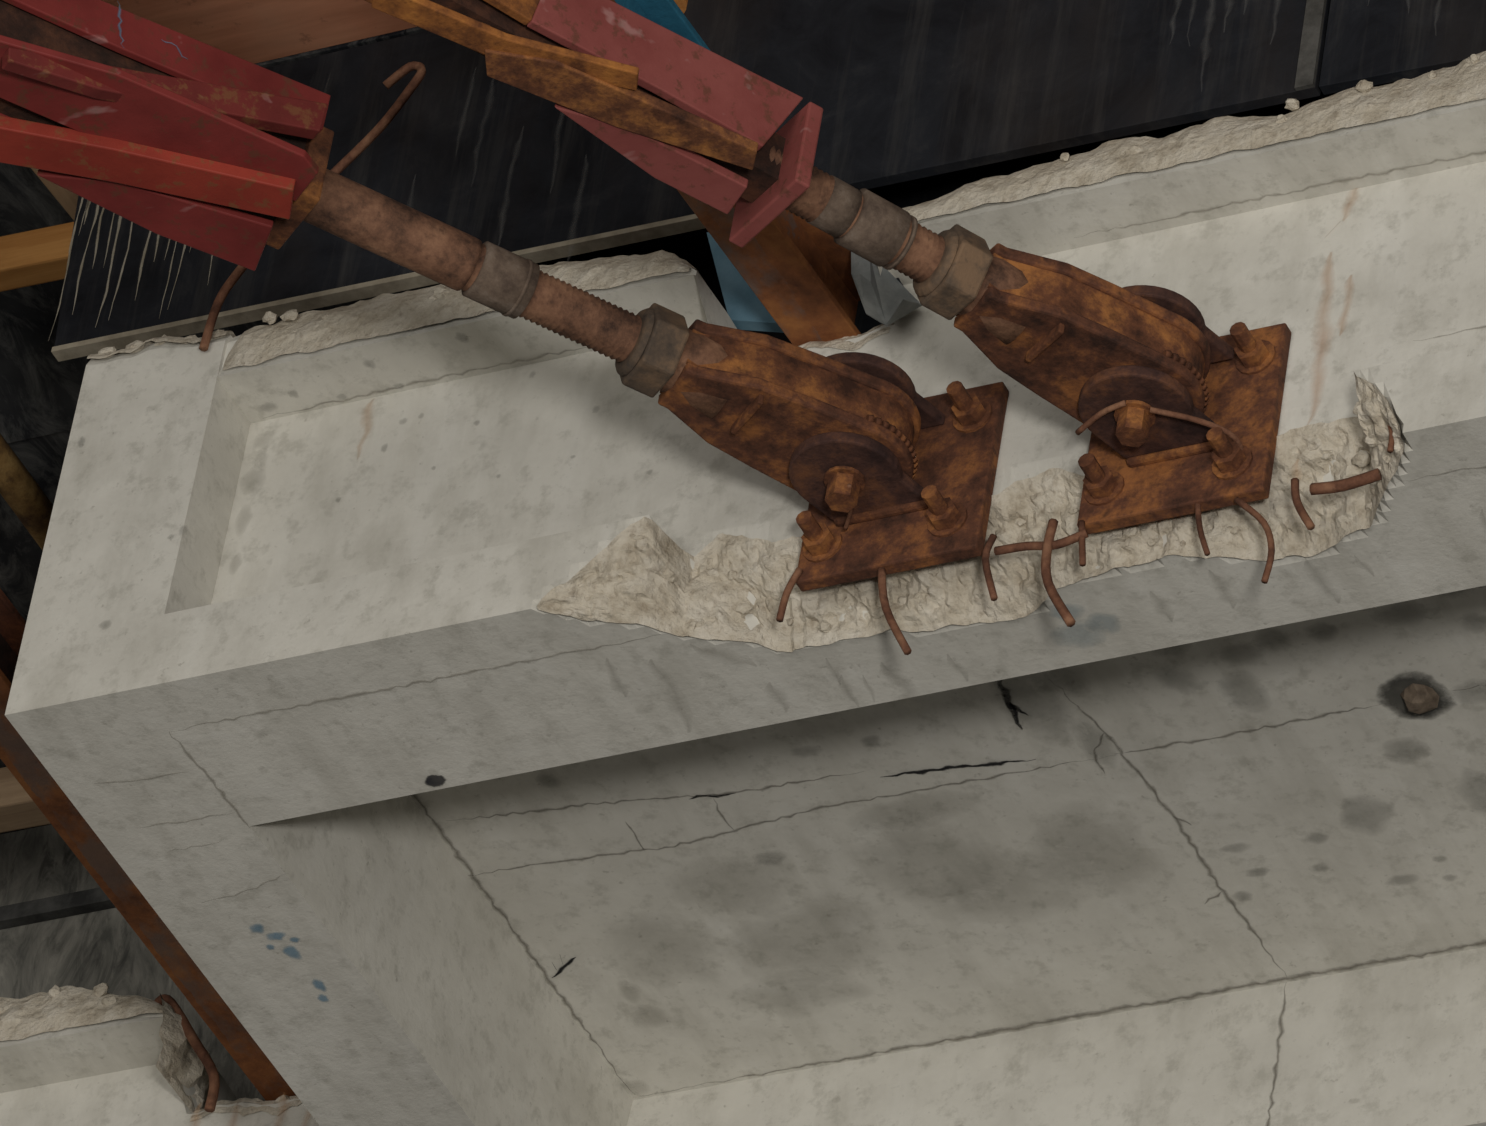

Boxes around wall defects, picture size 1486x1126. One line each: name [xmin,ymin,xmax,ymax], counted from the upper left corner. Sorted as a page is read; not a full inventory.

spalling [902,51,1486,221]
spalling [537,373,1404,655]
crack [450,680,1381,1126]
spalling [0,983,302,1121]